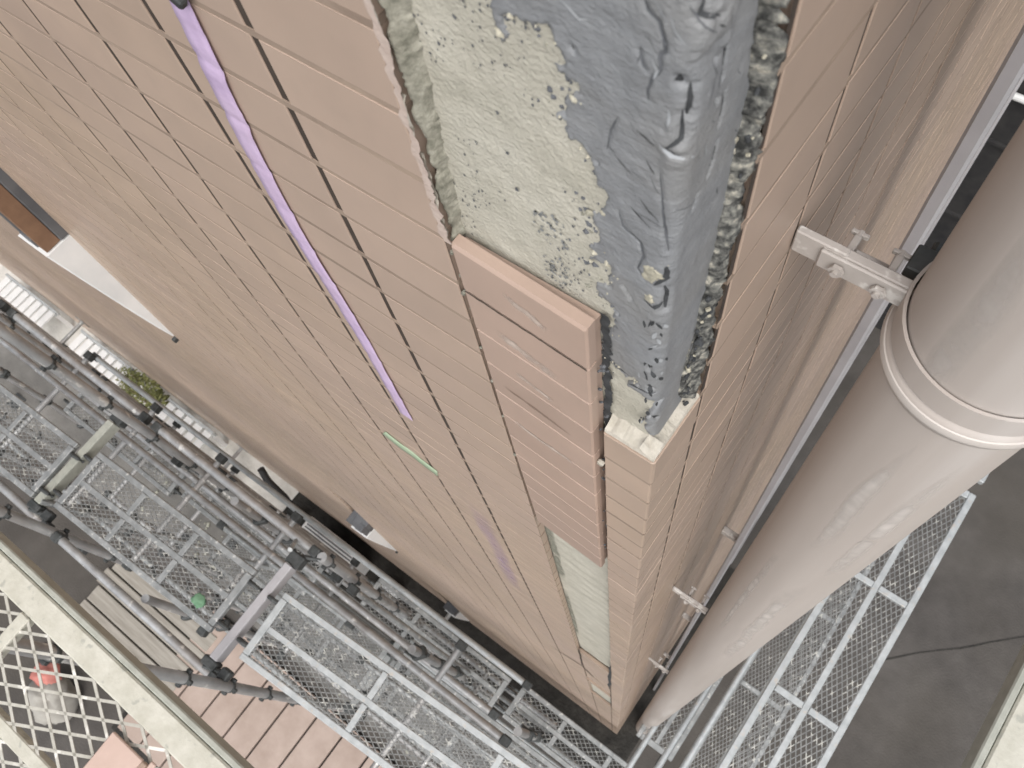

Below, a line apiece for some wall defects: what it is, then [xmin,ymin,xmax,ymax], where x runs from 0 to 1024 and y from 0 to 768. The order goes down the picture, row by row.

spalling [363,0,451,245]
spalling [665,82,694,156]
spalling [412,0,670,434]
peeling [682,296,711,406]
spalling [545,527,611,667]